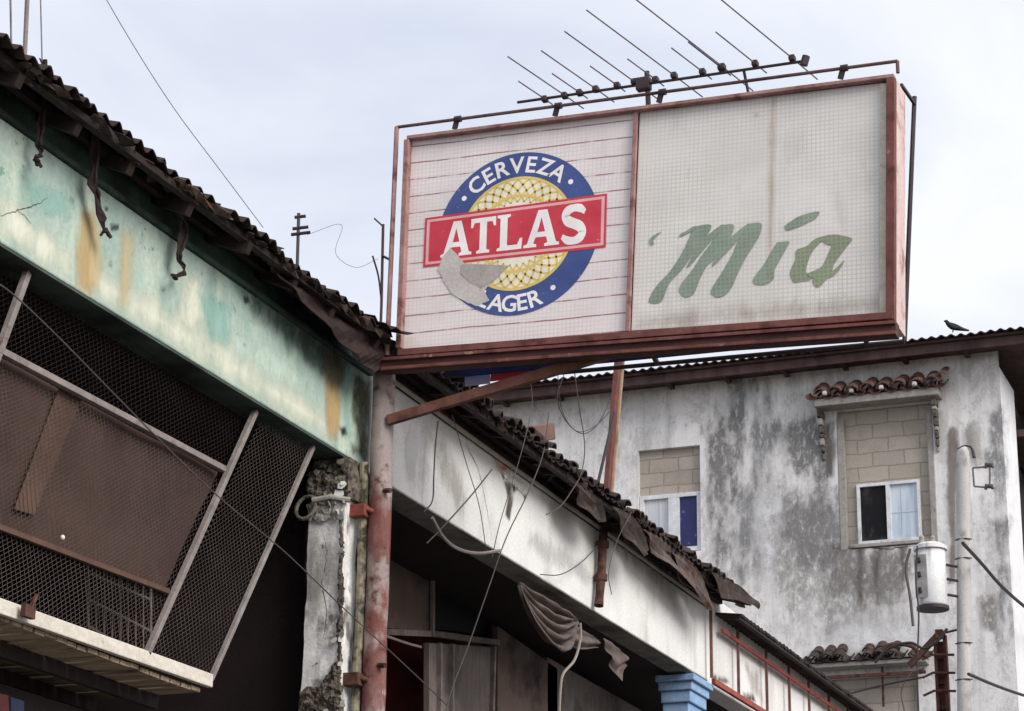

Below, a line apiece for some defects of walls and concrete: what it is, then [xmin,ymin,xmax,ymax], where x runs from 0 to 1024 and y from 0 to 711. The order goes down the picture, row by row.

water stain [984,409,1007,485]
water stain [709,378,910,601]
water stain [995,520,1011,546]
spalling [299,469,347,711]
water stain [981,567,1008,628]